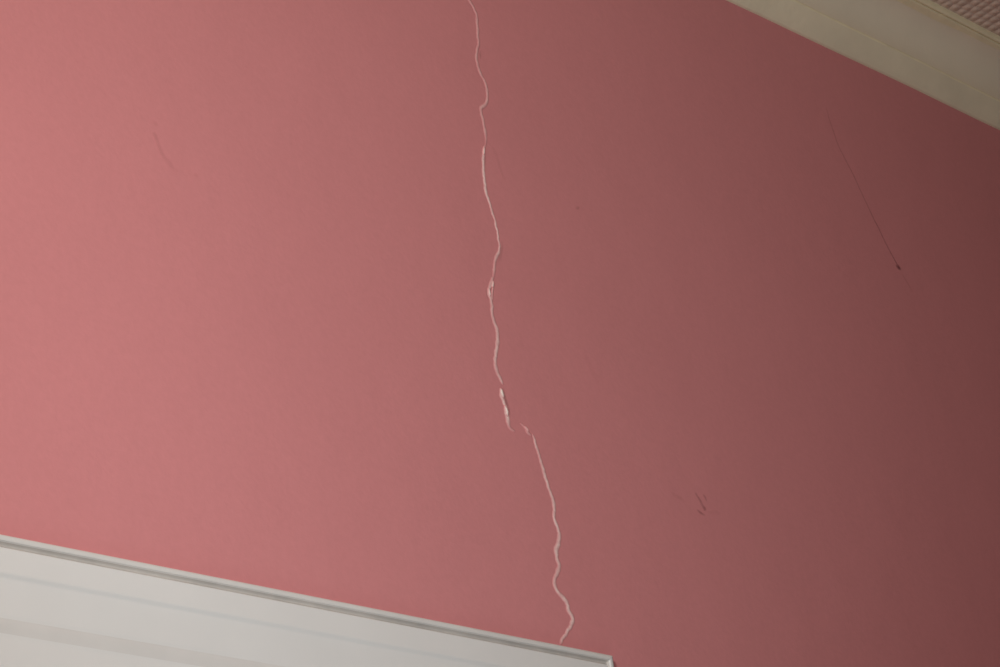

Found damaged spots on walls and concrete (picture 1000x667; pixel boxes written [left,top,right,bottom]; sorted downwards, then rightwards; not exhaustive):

crack [468,0,575,645]